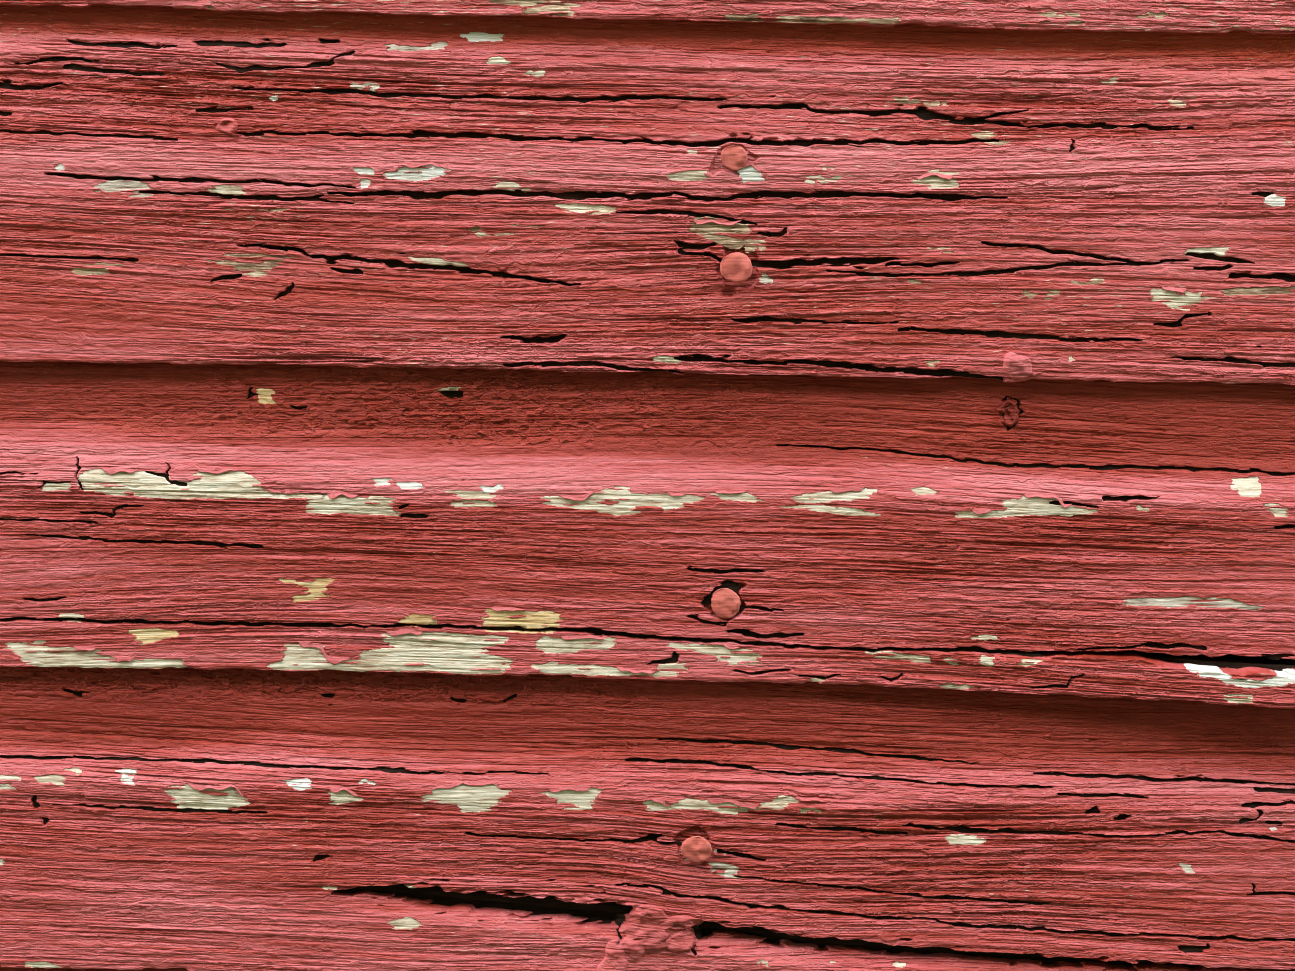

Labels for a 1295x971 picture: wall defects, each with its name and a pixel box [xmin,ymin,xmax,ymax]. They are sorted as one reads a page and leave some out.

peeling [42,467,424,516]
peeling [541,485,764,516]
peeling [780,486,881,516]
peeling [955,492,1098,518]
peeling [3,628,187,669]
peeling [267,607,763,678]
peeling [1184,663,1295,704]
peeling [164,783,250,810]
peeling [421,781,512,812]
crack [625,737,1295,842]
crack [466,831,682,846]
crack [333,849,1295,968]